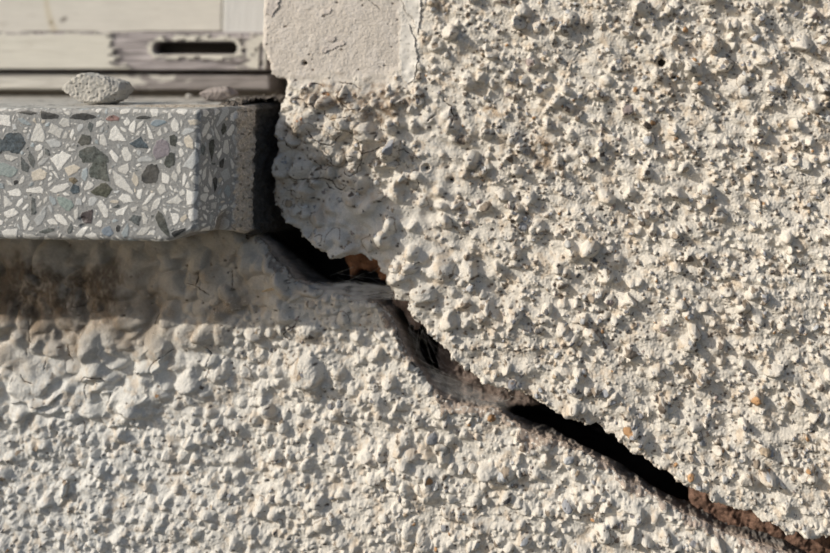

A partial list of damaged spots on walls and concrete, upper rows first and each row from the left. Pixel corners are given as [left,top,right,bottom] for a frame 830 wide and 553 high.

crack [286,82,410,193]
water stain [0,265,120,324]
crack [246,229,830,553]